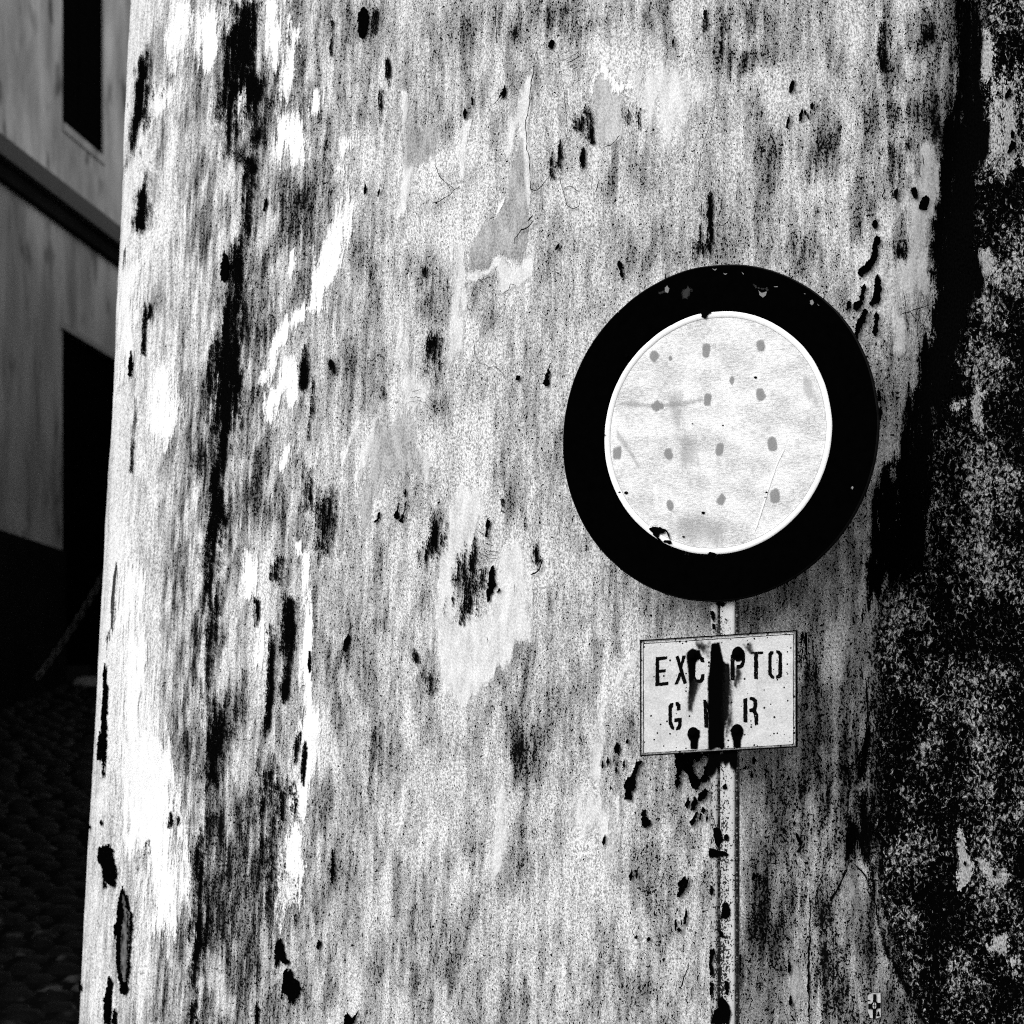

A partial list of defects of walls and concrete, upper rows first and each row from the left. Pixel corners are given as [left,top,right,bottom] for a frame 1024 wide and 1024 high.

flaking render [445,75,534,364]
flaking render [846,140,941,355]
water stain [863,0,993,614]
water stain [110,0,360,1024]
spalling [97,844,133,1024]
spalling [641,809,651,828]
spalling [674,876,689,932]
peeling [672,752,710,826]
water stain [840,720,910,996]